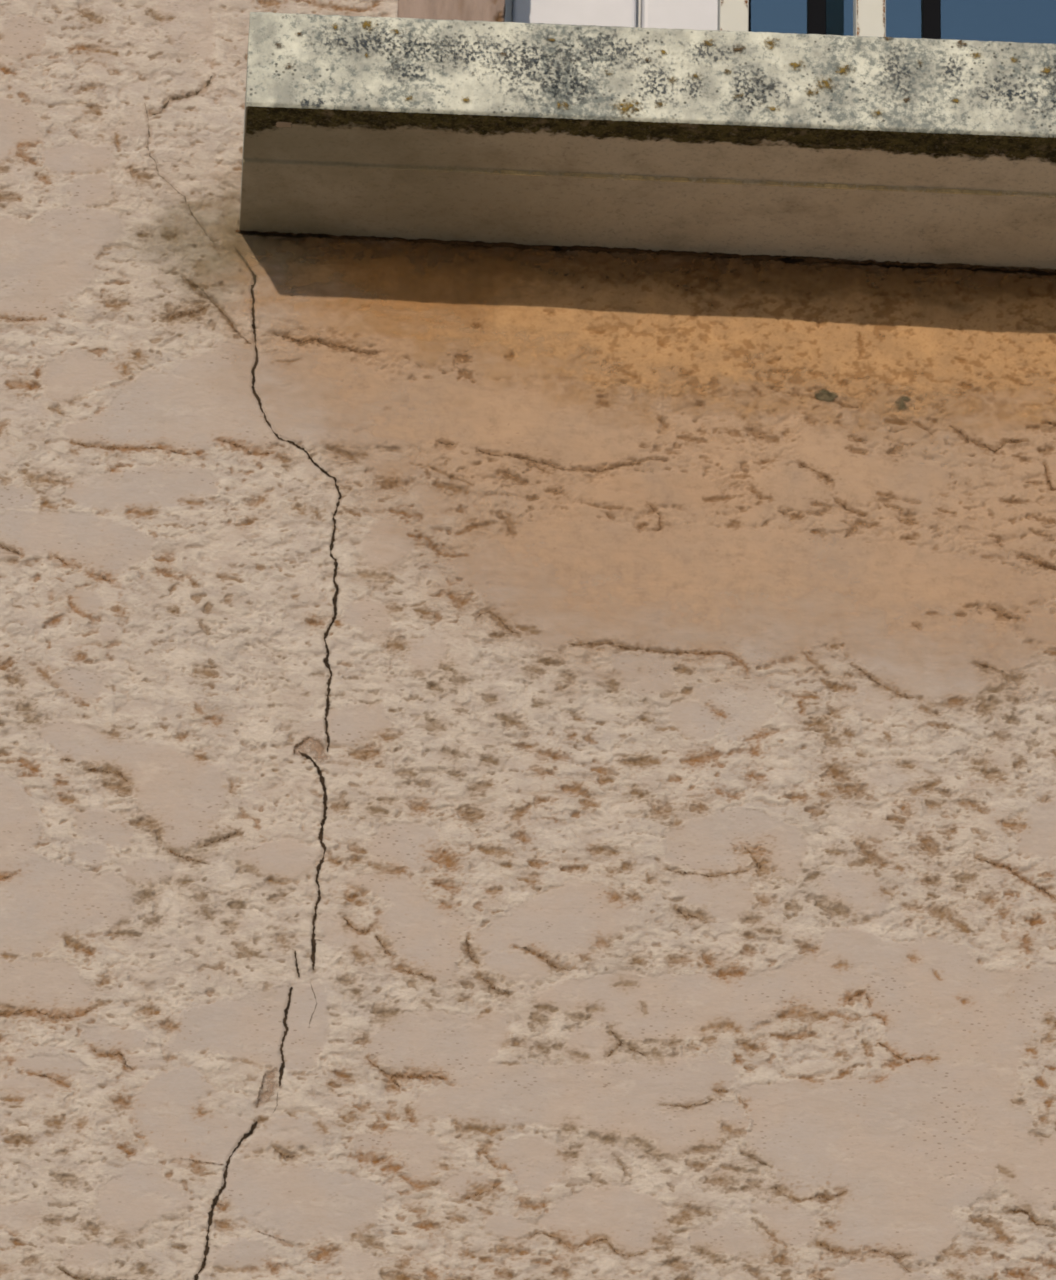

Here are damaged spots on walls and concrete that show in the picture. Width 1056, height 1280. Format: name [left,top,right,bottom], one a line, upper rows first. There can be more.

crack [145,76,341,1280]